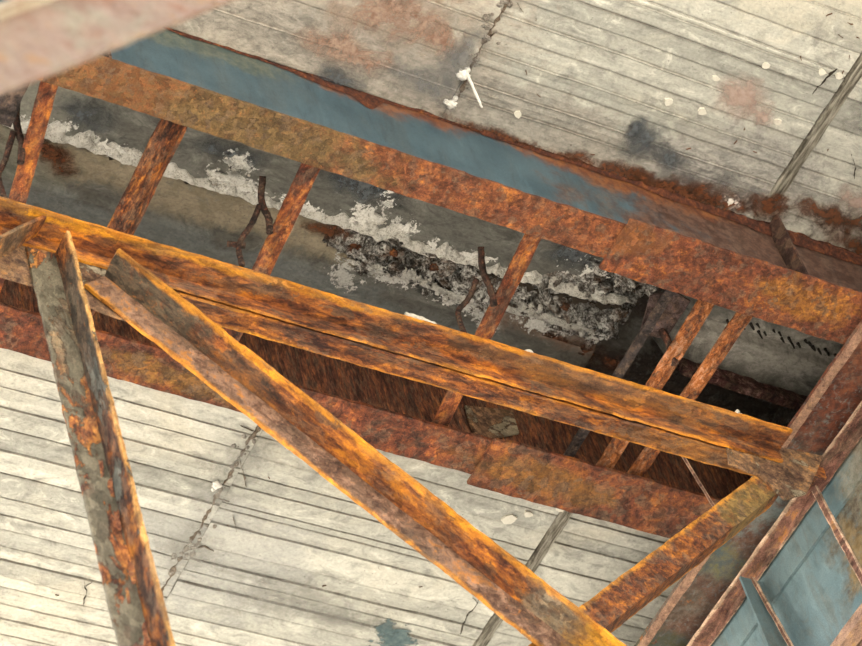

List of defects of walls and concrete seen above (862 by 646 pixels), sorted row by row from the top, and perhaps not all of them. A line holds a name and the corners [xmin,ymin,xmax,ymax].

crack [455,0,524,102]
corrosion [40,143,77,175]
water stain [44,102,142,167]
water stain [163,142,286,210]
corrosion [301,223,362,251]
water stain [299,174,508,279]
spalling [322,227,502,309]
corrosion [460,122,541,150]
water stain [521,245,631,305]
spalling [509,258,658,353]
corrosion [552,151,862,256]
crack [161,425,261,594]